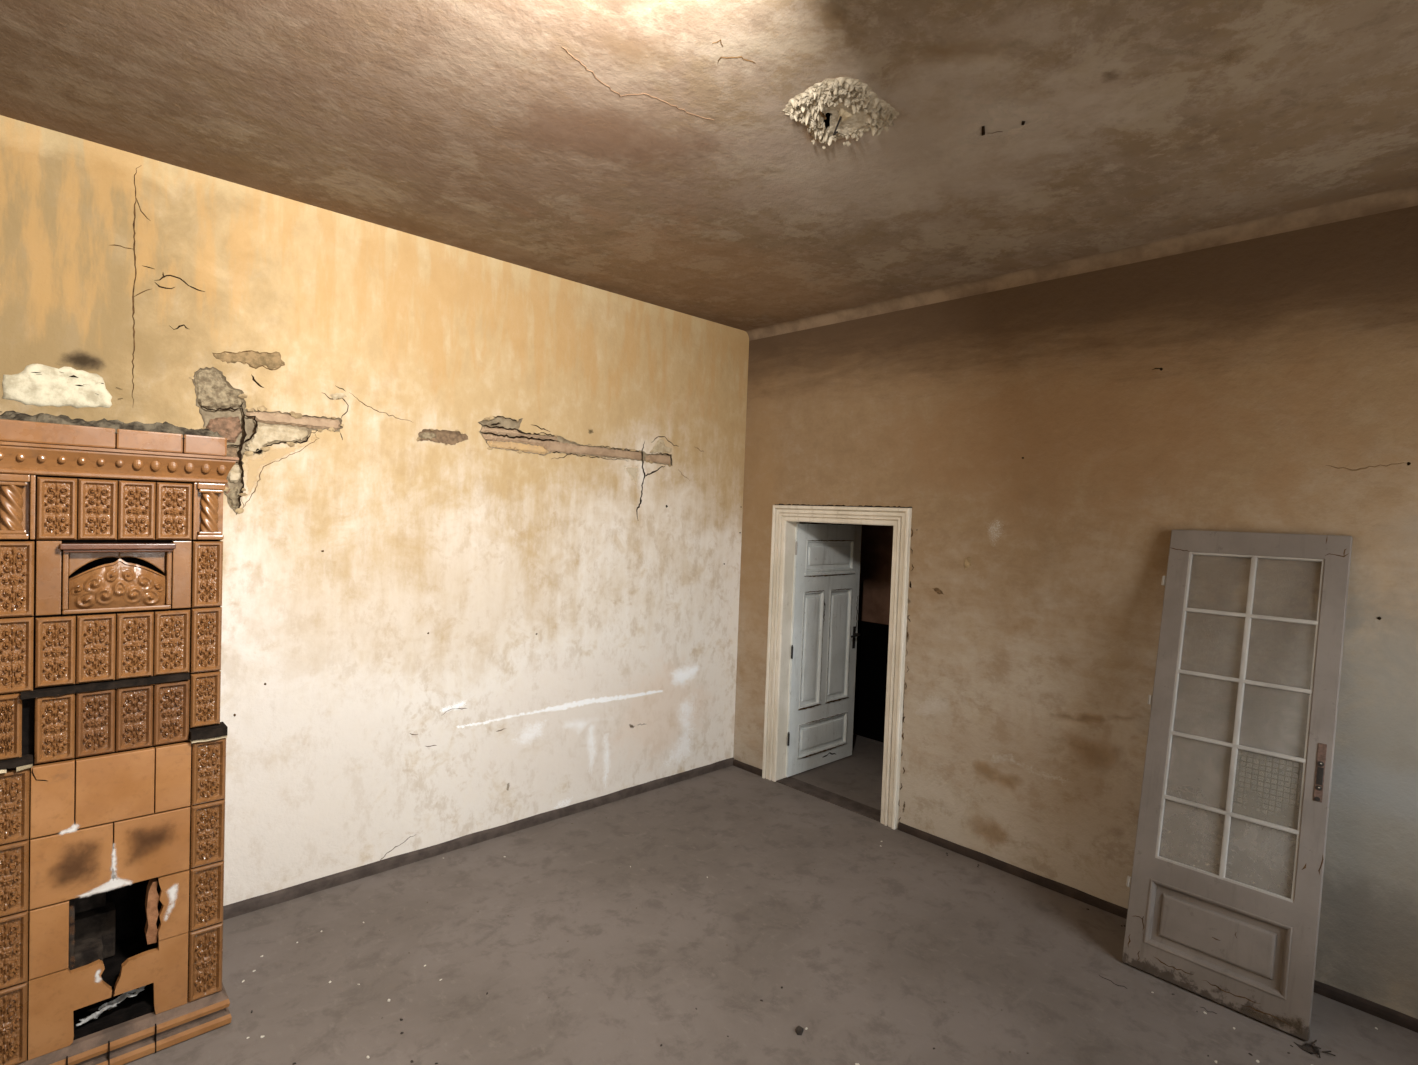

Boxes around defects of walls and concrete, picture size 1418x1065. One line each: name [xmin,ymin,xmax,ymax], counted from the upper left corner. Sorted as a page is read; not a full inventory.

peeling [823,108,853,128]
crack [113,165,205,403]
spalling [189,350,344,515]
spalling [416,416,677,467]
damp [513,715,611,788]